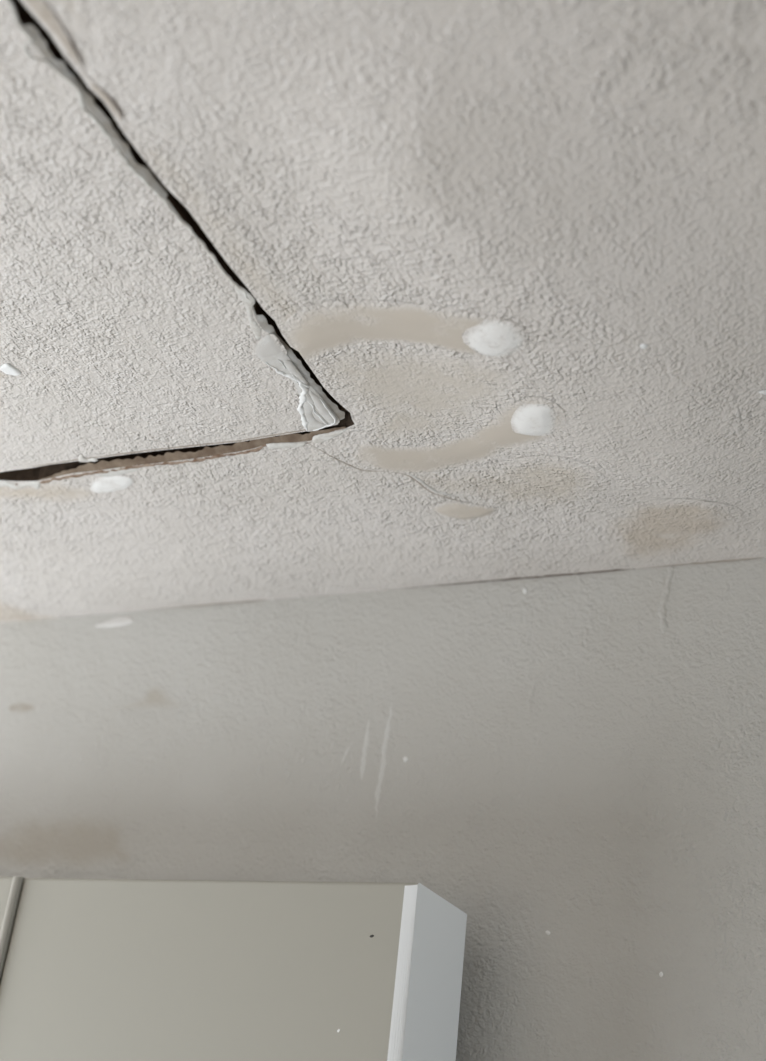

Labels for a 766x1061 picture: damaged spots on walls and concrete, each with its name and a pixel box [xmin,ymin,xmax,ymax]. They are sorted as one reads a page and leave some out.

crack [0,0,465,502]
leakage [308,344,528,446]